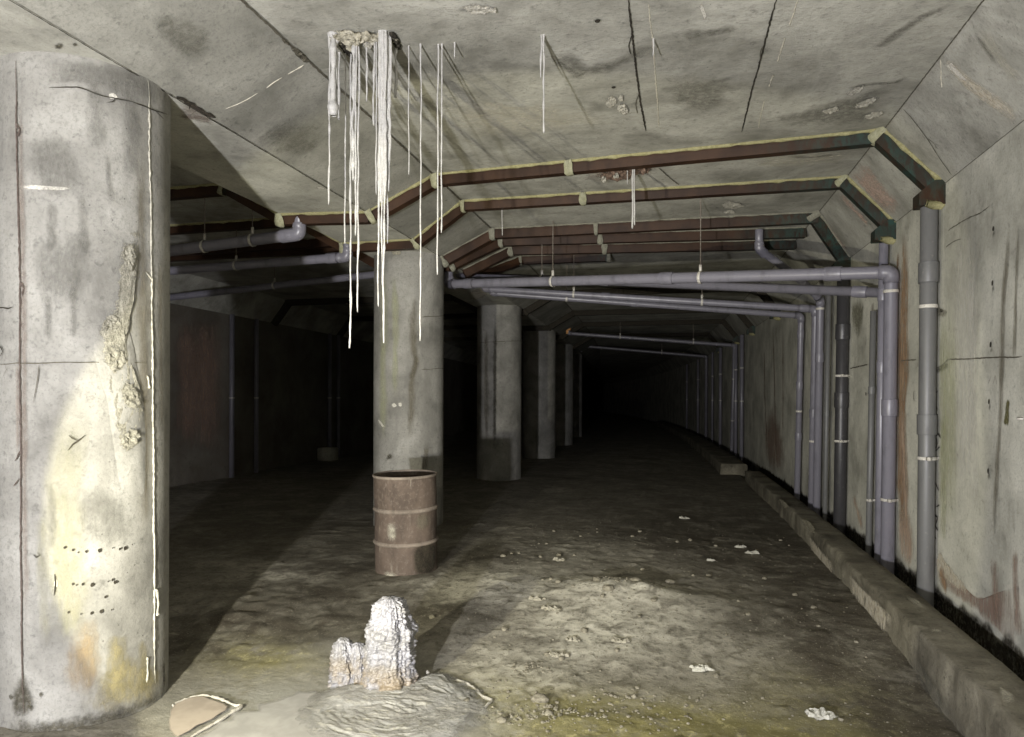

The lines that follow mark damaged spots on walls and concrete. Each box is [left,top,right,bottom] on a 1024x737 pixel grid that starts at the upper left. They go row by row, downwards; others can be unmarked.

crack [9,0,138,76]
crack [49,0,490,228]
crack [628,0,646,130]
crack [741,0,777,132]
leakage [19,83,165,733]
rust [897,245,911,555]
leakage [745,460,833,526]
leakage [845,525,874,558]
leakage [894,557,917,592]
leakage [934,554,1024,681]
rust [940,557,1019,630]